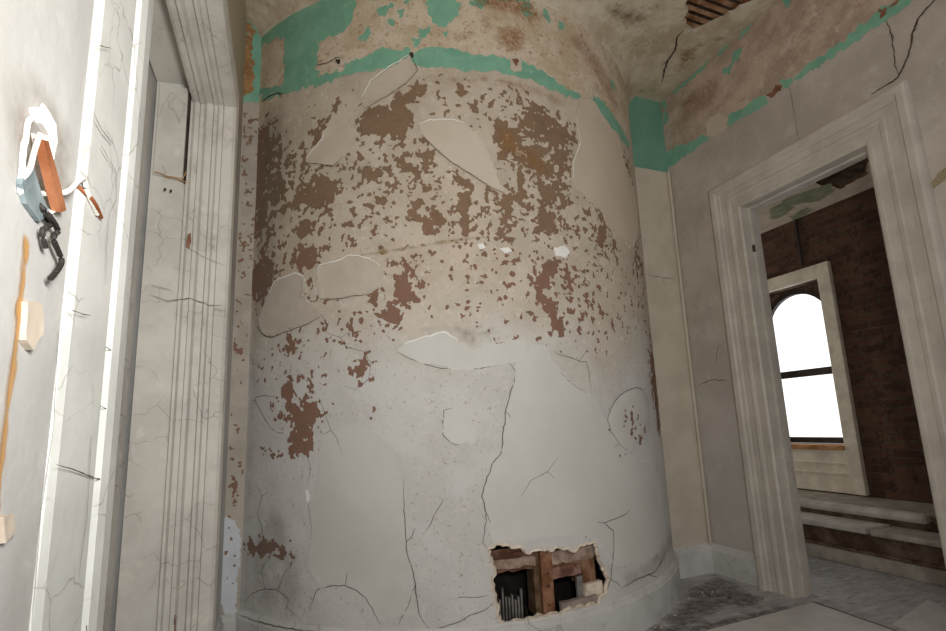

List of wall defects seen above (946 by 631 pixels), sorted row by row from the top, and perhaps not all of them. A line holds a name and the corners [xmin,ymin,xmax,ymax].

crack [662,31,683,81]
peeling [661,0,912,167]
crack [872,0,935,94]
flaking render [18,301,44,350]
peeling [221,0,666,623]
crack [607,357,659,448]
crack [481,363,516,538]
flaking render [0,514,16,544]
crack [241,484,492,631]
crack [598,509,666,590]